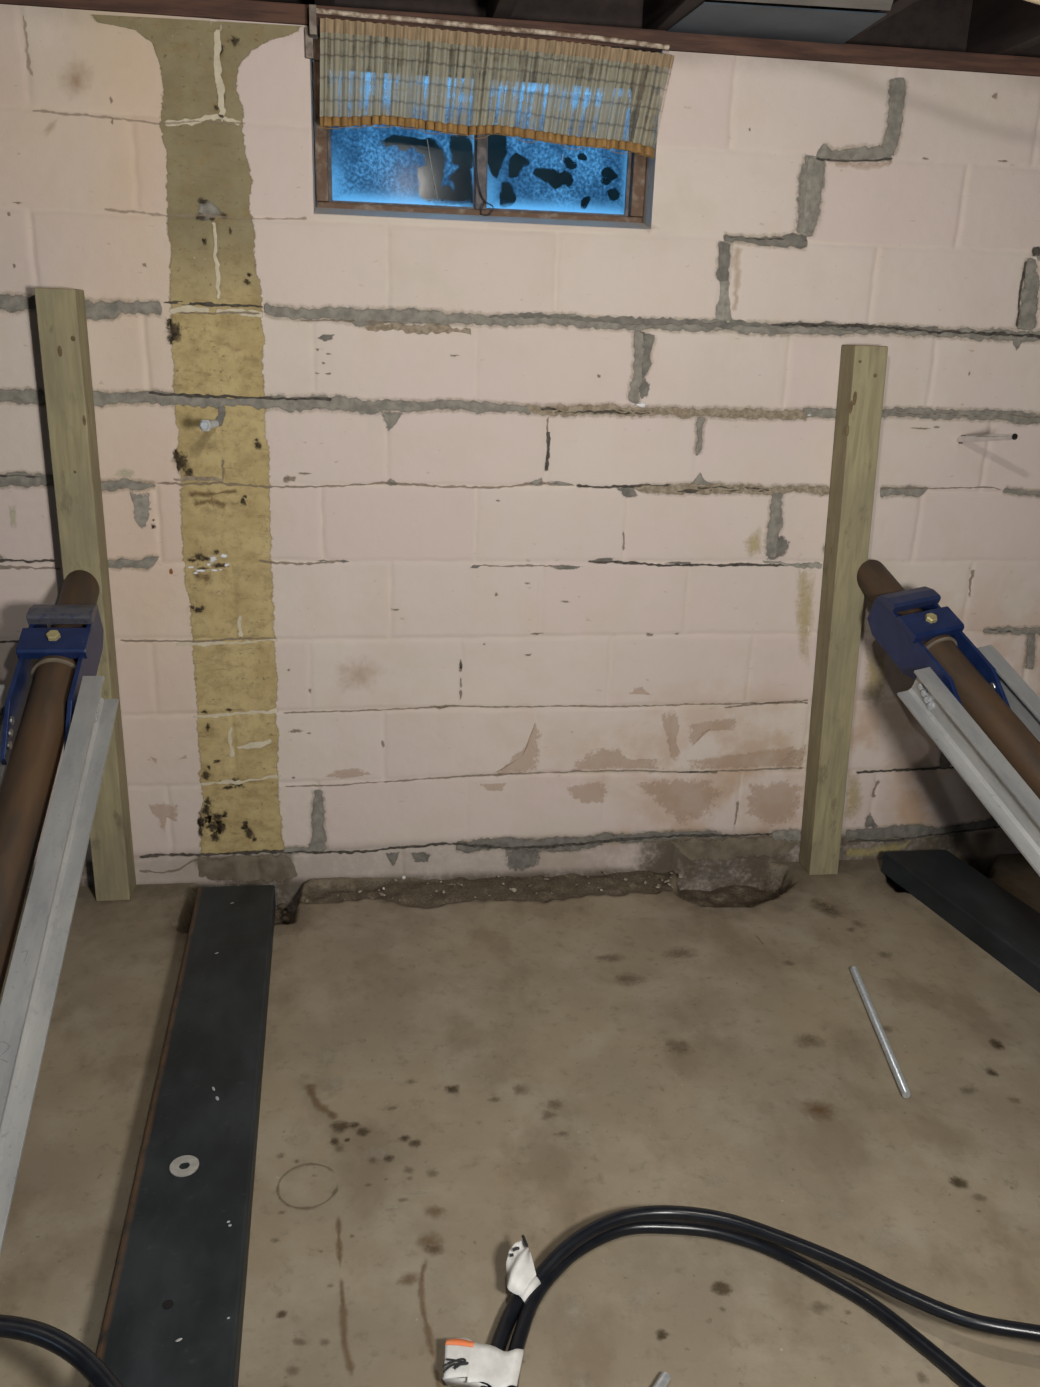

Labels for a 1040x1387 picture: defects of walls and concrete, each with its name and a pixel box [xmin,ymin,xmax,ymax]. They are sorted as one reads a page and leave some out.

crack [0,294,36,313]
crack [85,78,1040,570]
crack [0,388,46,405]
crack [0,471,54,488]